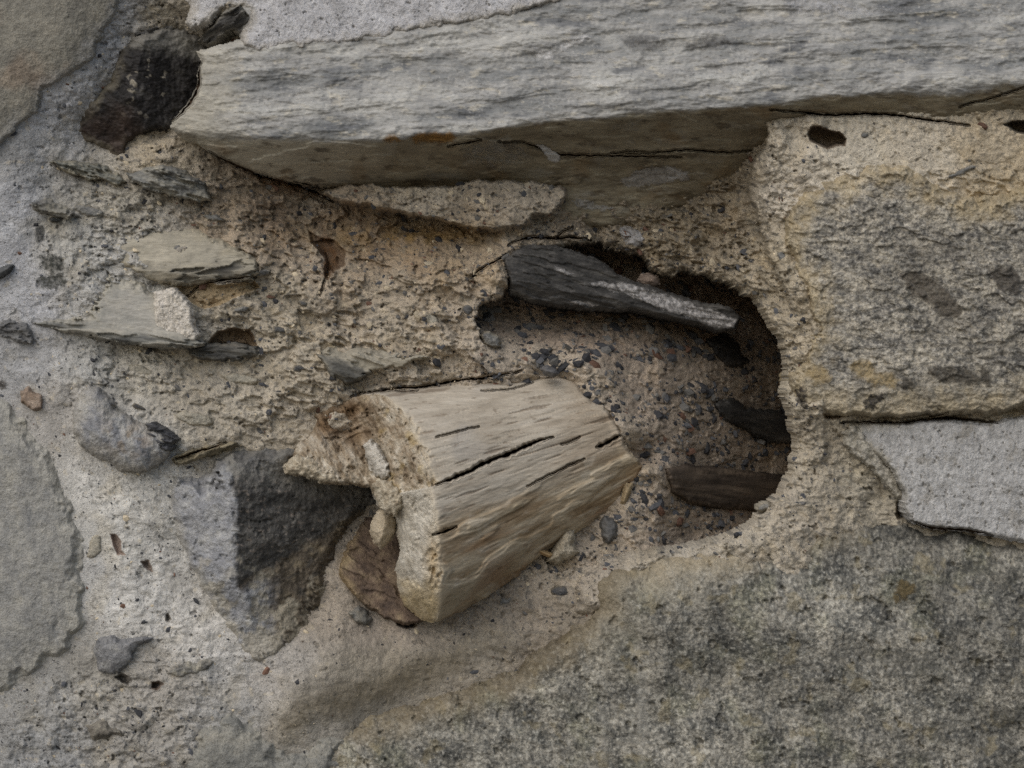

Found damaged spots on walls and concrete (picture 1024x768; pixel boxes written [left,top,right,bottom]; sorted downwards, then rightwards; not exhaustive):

crack [447,139,752,159]
crack [350,370,534,397]
spalling [599,515,618,544]